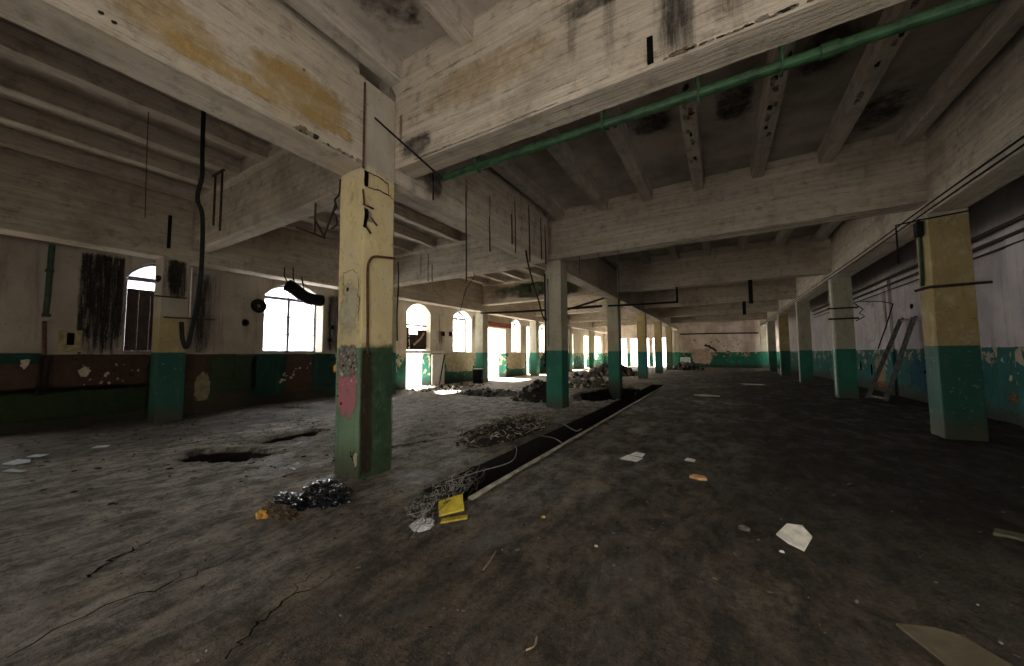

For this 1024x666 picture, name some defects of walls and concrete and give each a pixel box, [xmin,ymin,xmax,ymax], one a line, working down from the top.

water stain [563,0,612,18]
water stain [661,0,693,48]
water stain [155,6,349,141]
spalling [363,207,374,228]
water stain [77,253,125,355]
flaking render [0,354,150,396]
peeling [333,345,357,419]
crack [6,535,268,658]
crack [225,567,334,659]